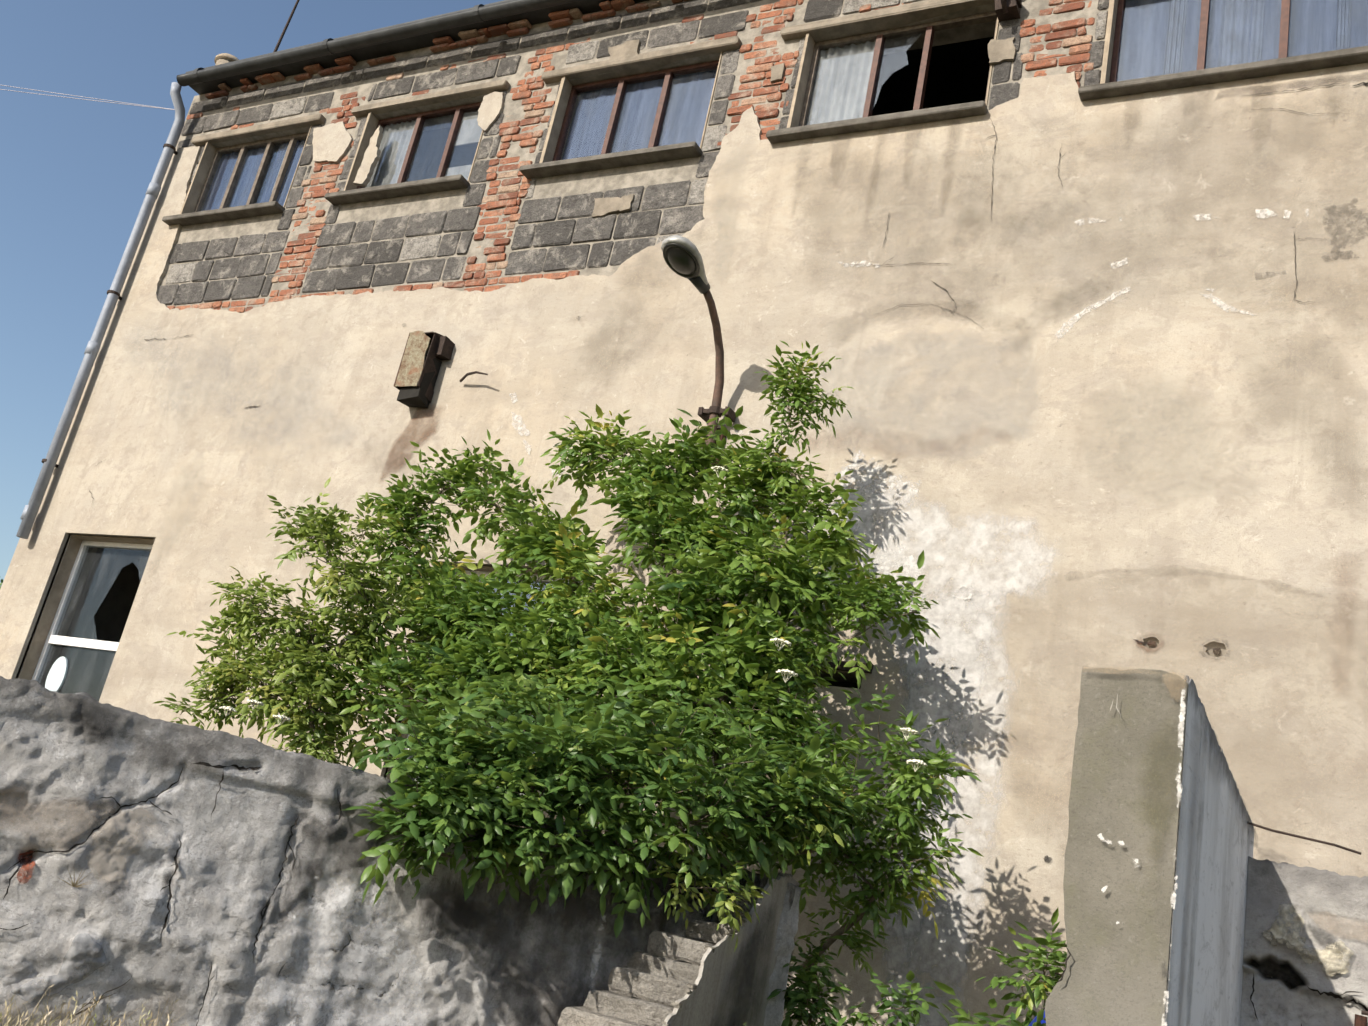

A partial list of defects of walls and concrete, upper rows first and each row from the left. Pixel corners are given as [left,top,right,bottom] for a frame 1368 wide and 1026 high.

flaking render [988,0,1109,110]
crack [1240,82,1368,115]
flaking render [158,0,923,313]
peeling [1255,208,1309,218]
peeling [1055,287,1129,342]
water stain [806,450,1053,1026]
crack [0,762,260,944]
crack [336,790,344,821]
crack [252,816,399,1002]
spalling [1248,904,1353,989]